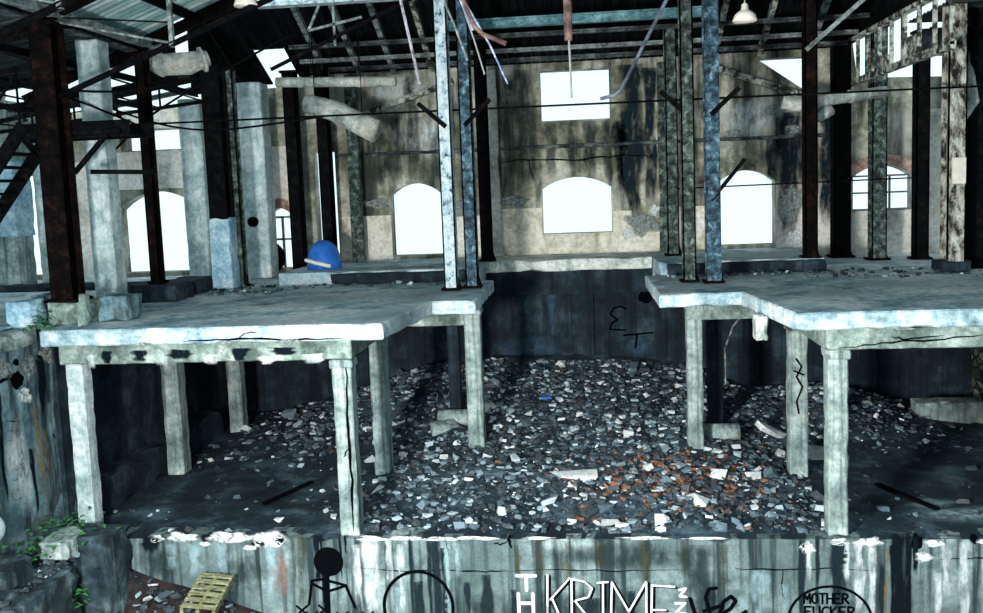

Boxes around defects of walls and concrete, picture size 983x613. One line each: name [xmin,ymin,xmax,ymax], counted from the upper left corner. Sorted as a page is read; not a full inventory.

leakage [496,71,534,177]
leakage [546,125,556,167]
leakage [568,63,658,212]
spalling [0,345,53,403]
leakage [142,535,171,571]
leakage [191,534,222,565]
peeling [151,531,285,550]
leakage [238,563,254,581]
leakage [251,535,294,590]
leakage [313,535,322,554]
leakage [338,535,387,606]
leakage [798,533,918,613]